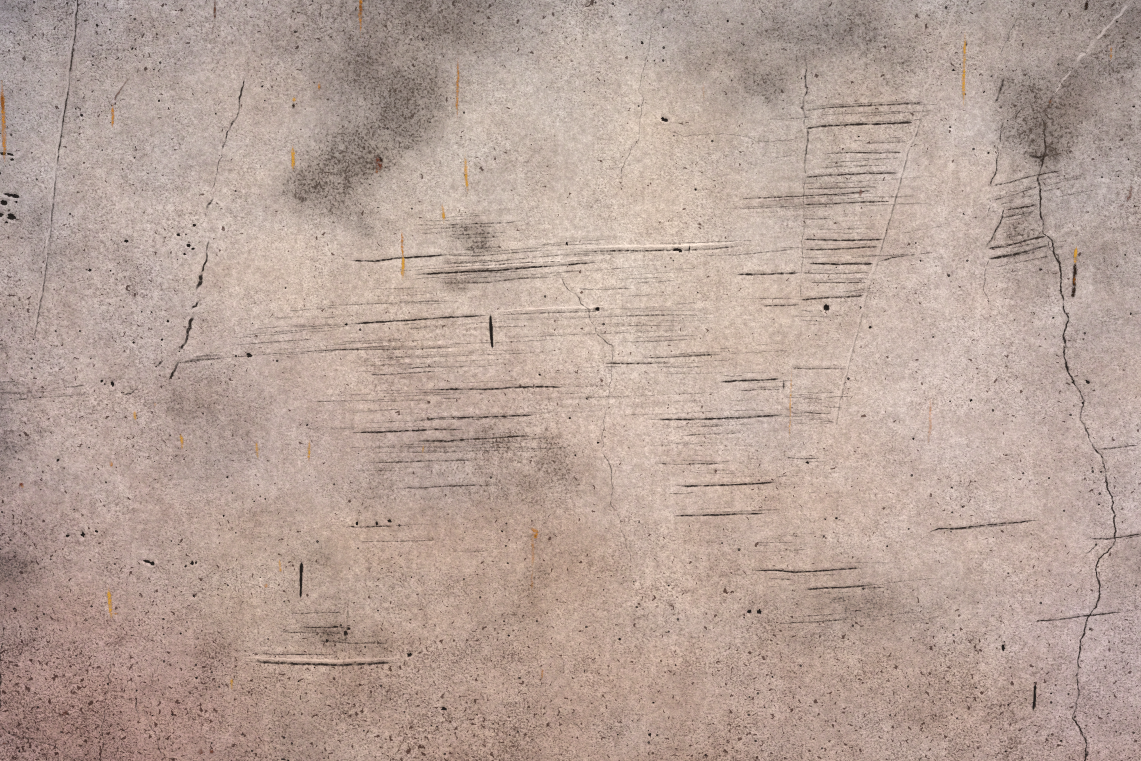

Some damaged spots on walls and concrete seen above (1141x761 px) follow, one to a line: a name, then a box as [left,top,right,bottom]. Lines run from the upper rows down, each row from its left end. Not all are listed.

crack [159,245,208,378]
crack [990,74,1116,761]